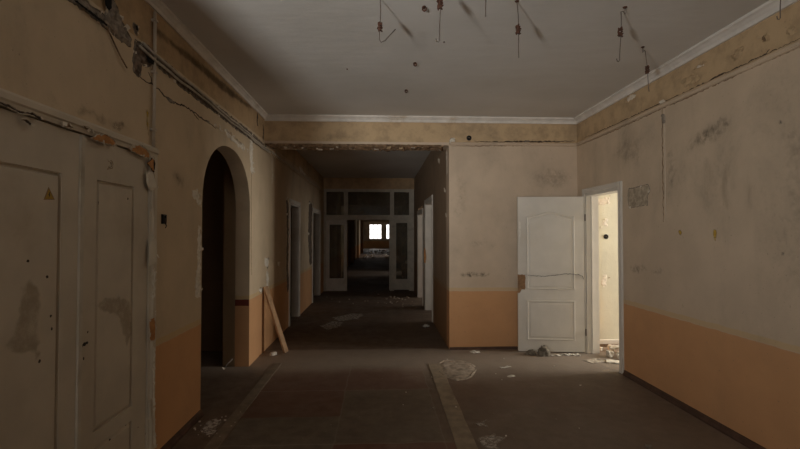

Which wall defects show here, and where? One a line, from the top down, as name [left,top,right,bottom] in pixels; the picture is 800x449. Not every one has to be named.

crack [140,72,215,128]
spalling [68,0,455,174]
crack [460,39,798,222]